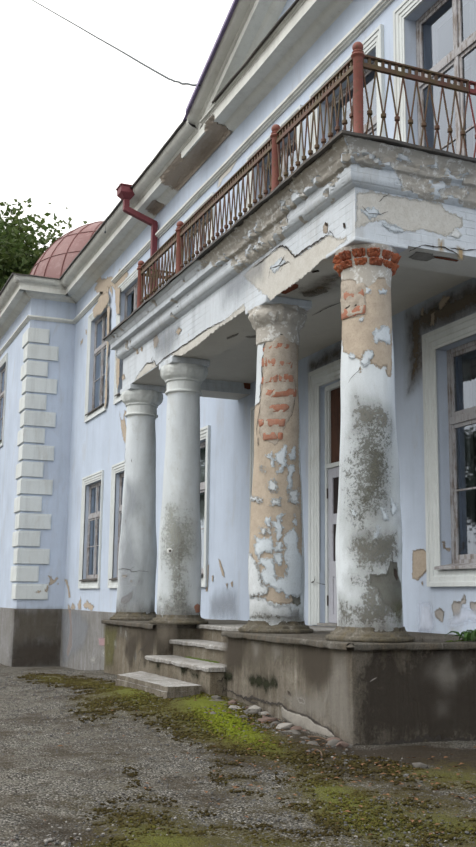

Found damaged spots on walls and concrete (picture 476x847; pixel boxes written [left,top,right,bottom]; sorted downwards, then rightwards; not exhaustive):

peeling [355,190,463,238]
crack [253,231,334,271]
peeling [243,235,459,377]
peeling [248,335,303,605]
damp [355,447,386,516]
peeling [36,576,94,611]
flaking render [369,561,402,612]
peeling [412,548,426,585]
peeling [434,594,476,622]
crack [219,677,348,743]